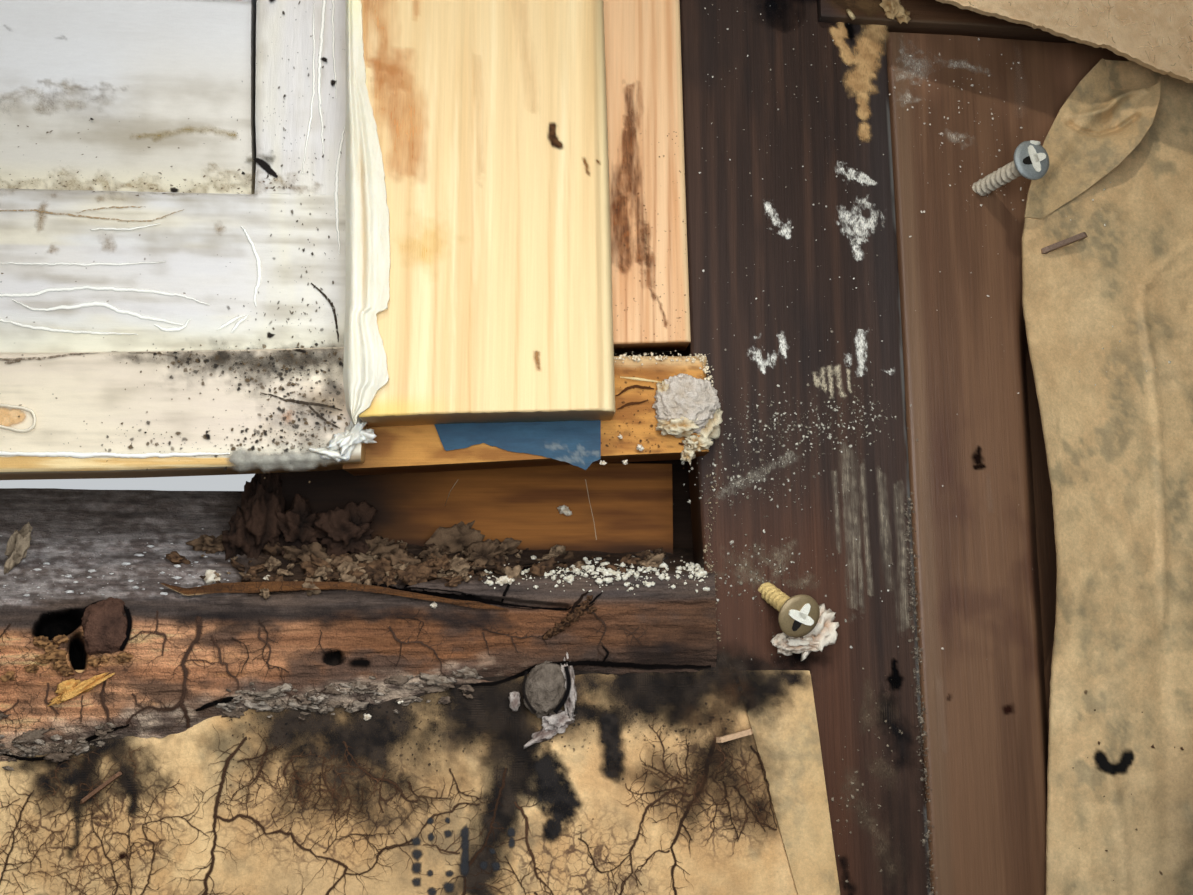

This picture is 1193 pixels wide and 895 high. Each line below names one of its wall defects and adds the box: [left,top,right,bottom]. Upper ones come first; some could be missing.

crack [0,206,183,222]
damp [101,267,348,479]
mould [179,610,277,627]
mould [295,609,503,628]
crack [196,697,241,712]
crack [3,724,129,761]
mould [229,642,813,895]
mould [18,735,161,857]